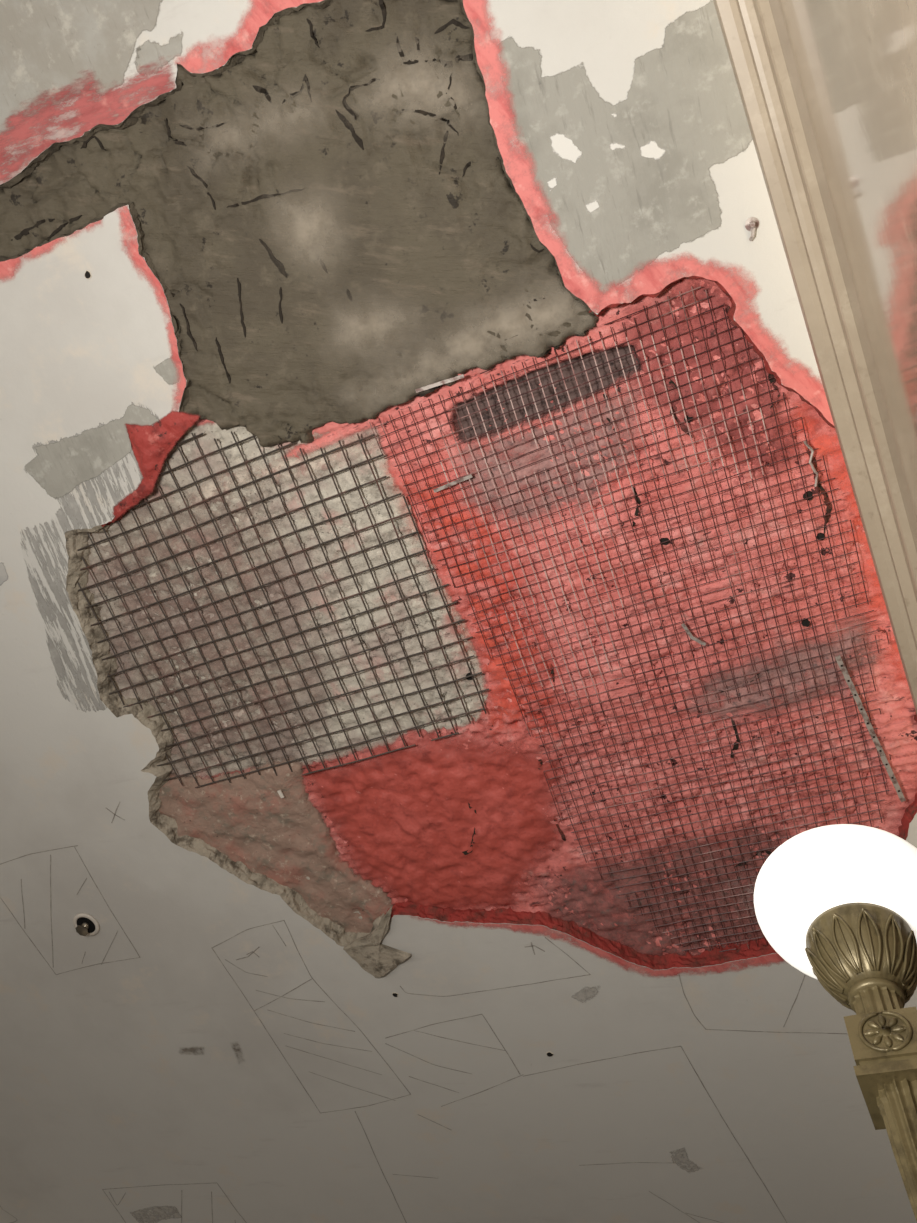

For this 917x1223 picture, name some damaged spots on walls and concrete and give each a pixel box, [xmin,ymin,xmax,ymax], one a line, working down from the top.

spalling [0,0,917,978]